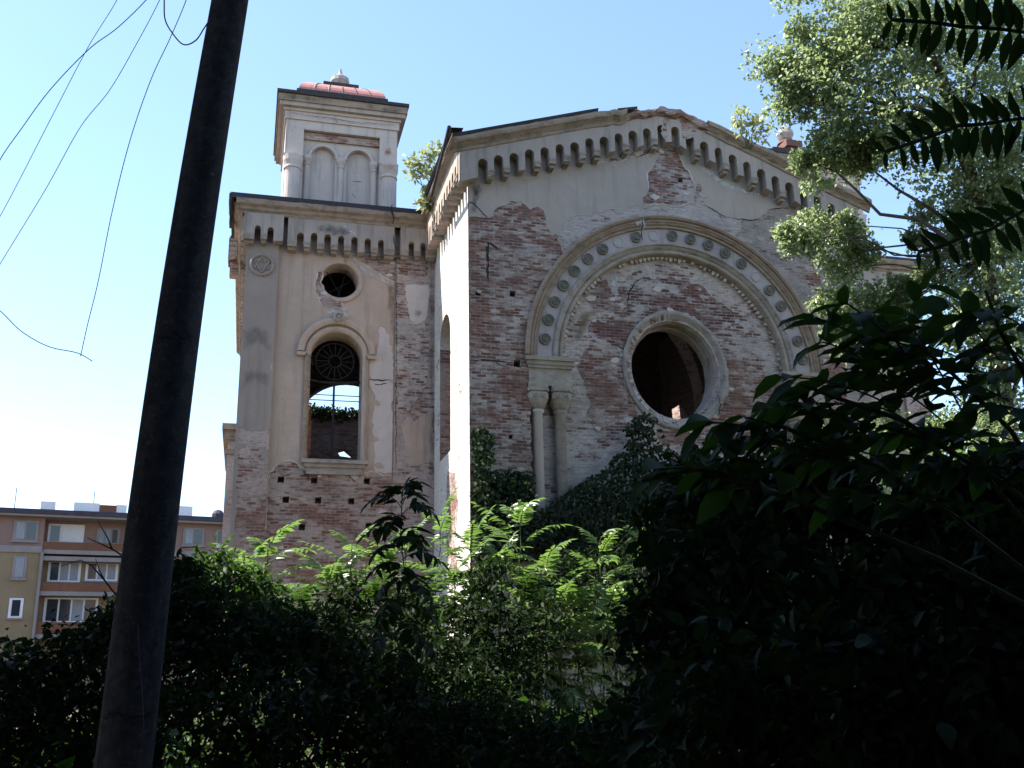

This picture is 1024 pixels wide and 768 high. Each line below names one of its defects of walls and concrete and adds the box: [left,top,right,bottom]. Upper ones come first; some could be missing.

peeling [231,253,431,603]
peeling [446,116,873,589]
crack [704,204,786,221]